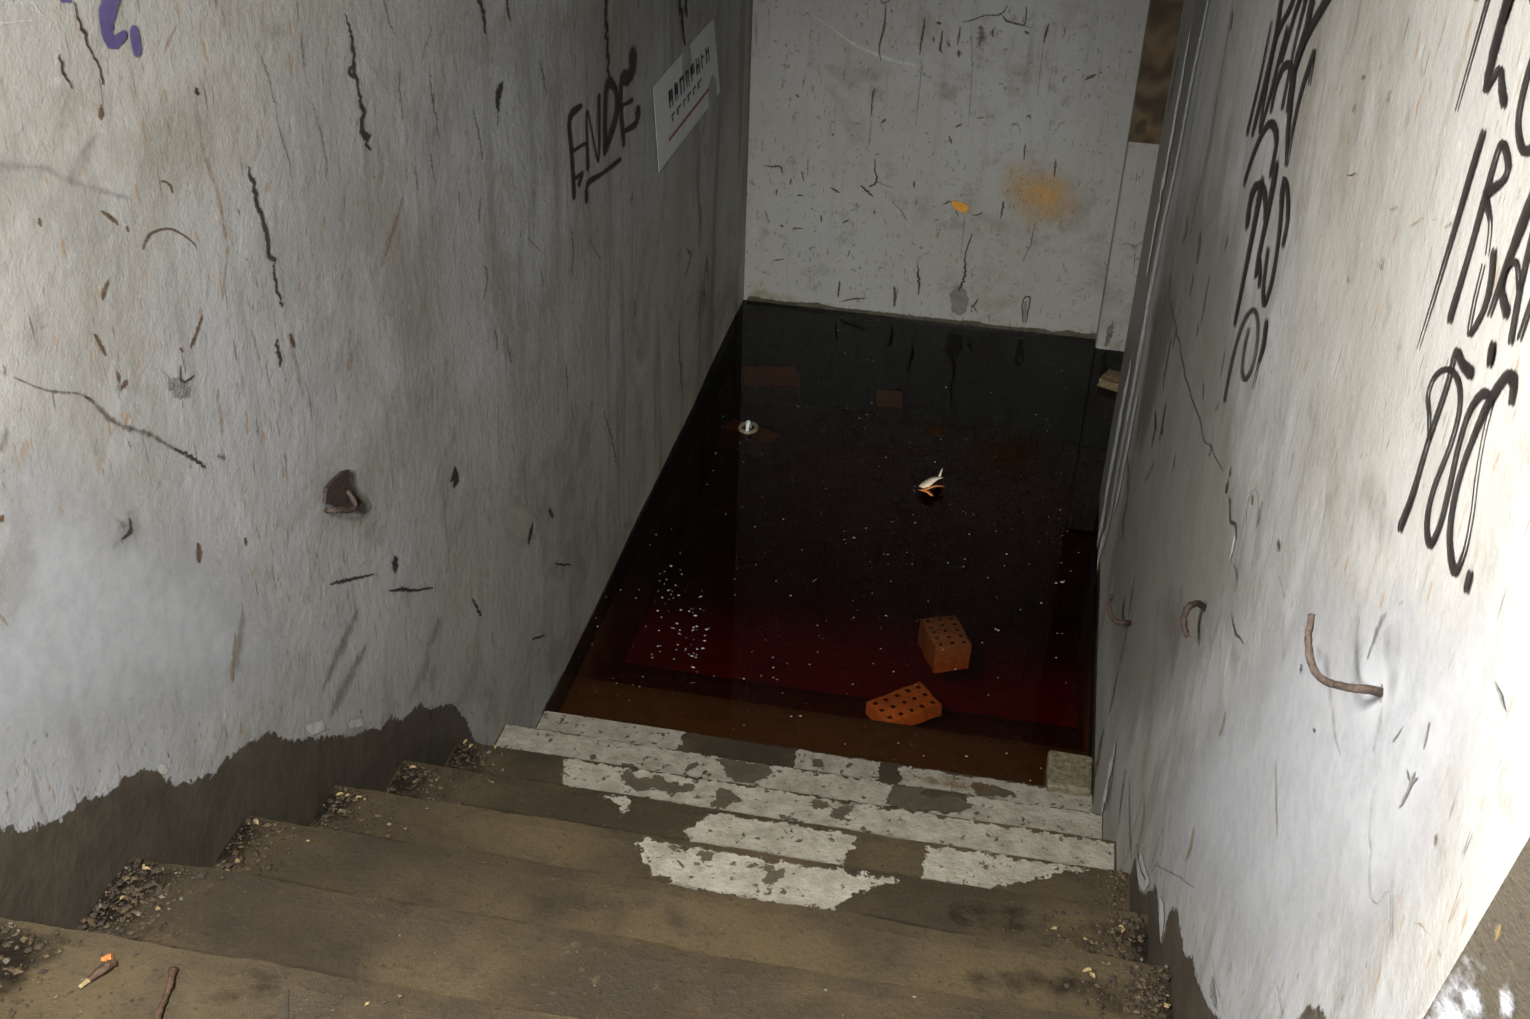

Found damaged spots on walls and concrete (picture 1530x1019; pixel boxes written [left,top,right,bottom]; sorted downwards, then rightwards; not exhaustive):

crack [14,377,224,469]
crack [1169,301,1243,644]
water stain [1088,493,1217,1019]
water stain [0,702,480,930]
water stain [1296,1004,1325,1019]
water stain [1437,988,1480,1019]
water stain [1501,992,1512,1013]